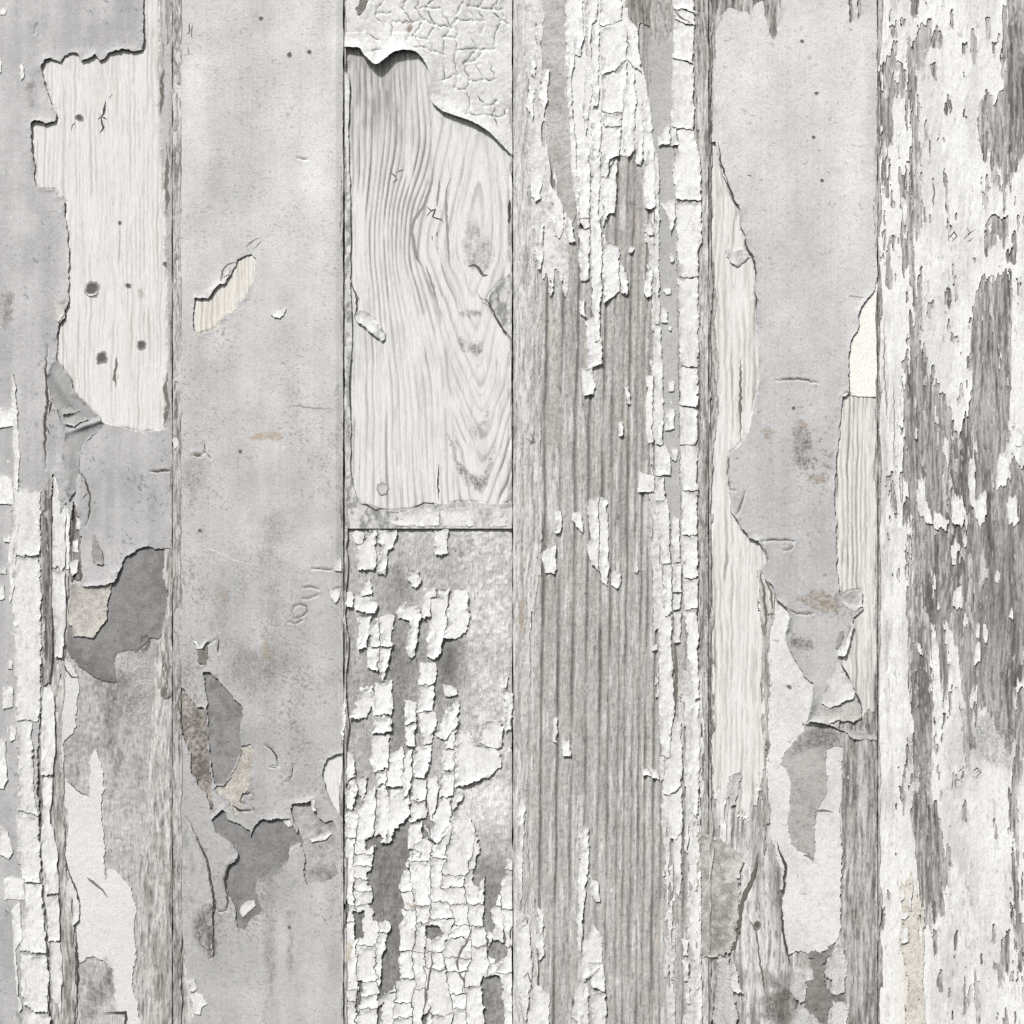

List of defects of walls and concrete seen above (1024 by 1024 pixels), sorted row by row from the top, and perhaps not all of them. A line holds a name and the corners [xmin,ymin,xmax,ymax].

peeling [0,372,173,1024]
peeling [31,0,179,449]
peeling [181,47,550,1024]
crack [366,0,507,126]
crack [422,927,472,1017]
peeling [525,0,1024,1024]